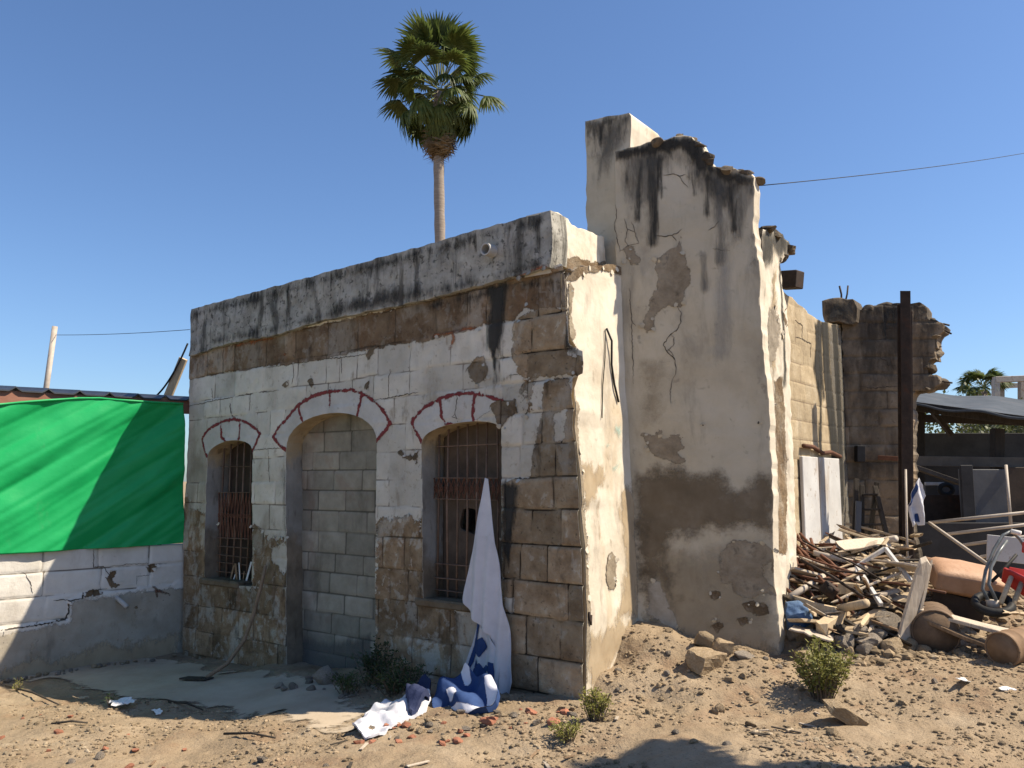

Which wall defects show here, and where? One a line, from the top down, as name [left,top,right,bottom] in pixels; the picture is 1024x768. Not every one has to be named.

water stain [528,216,540,243]
water stain [587,117,749,246]
water stain [331,279,508,381]
crack [663,308,682,400]
peeling [189,237,691,701]
water stain [582,464,605,511]
spalling [709,302,789,626]
crack [2,549,149,649]
peeling [0,495,289,676]
water stain [587,468,779,686]